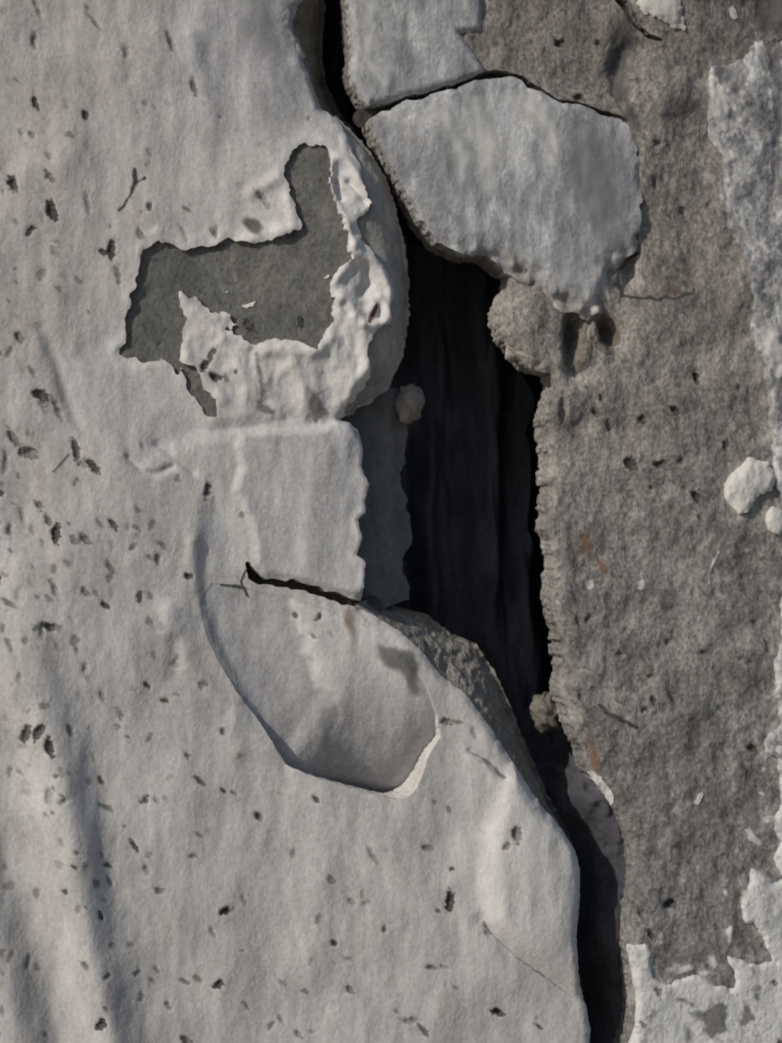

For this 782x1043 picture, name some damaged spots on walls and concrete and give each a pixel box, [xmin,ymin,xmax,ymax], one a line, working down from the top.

crack [292,0,504,149]
crack [607,0,635,117]
spalling [45,200,58,222]
spalling [99,225,121,284]
peeling [119,143,352,417]
spalling [71,439,100,486]
spalling [35,502,92,545]
peeling [334,0,782,1043]
spalling [19,724,55,759]
spalling [199,583,462,792]
crack [220,238,626,1043]
crack [598,704,638,728]